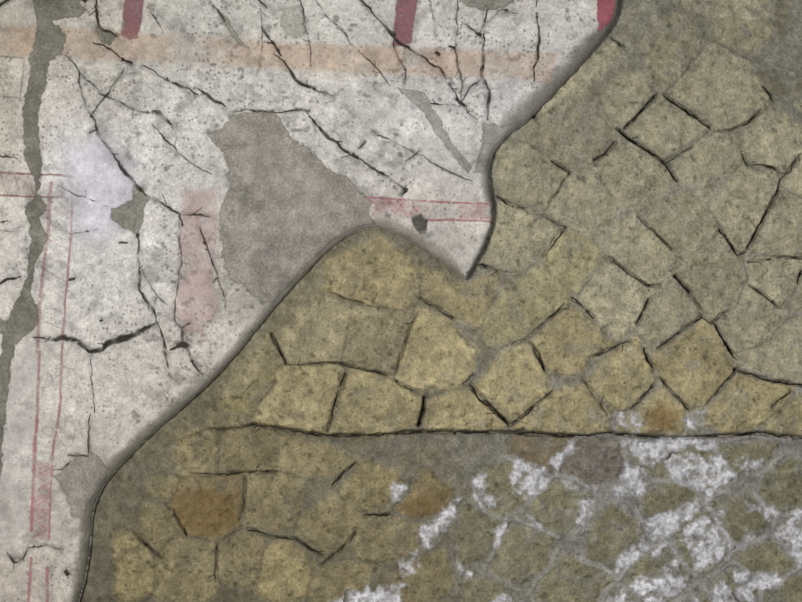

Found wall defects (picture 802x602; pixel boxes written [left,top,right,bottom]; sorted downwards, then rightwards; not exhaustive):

crack [71,0,408,194]
crack [360,0,491,121]
spalling [0,0,87,474]
spalling [111,185,150,234]
spalling [206,110,375,303]
spalling [413,215,428,232]
crack [34,233,203,384]
crack [253,362,802,441]
leakage [509,442,574,496]
leakage [615,412,764,574]
leakage [616,560,686,602]
leakage [713,569,783,602]